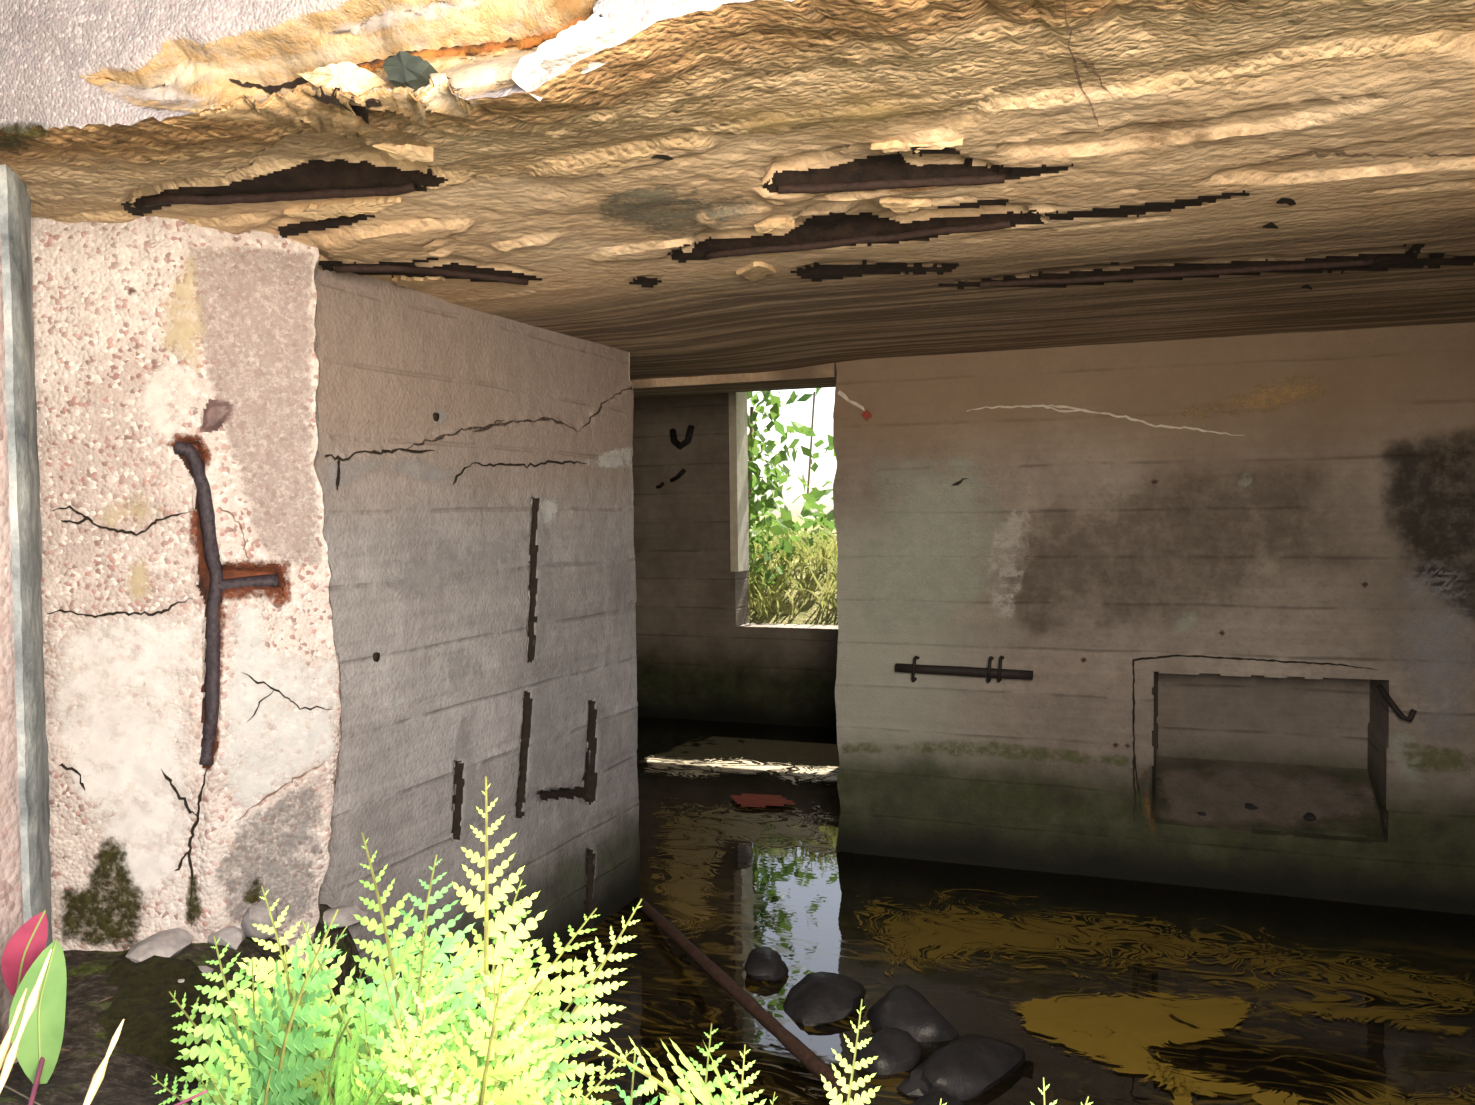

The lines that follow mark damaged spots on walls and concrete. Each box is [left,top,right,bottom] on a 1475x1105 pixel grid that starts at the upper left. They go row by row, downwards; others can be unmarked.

spalling [79,0,627,238]
spalling [668,139,1475,290]
spalling [629,277,662,288]
crack [967,405,1244,436]
crack [52,505,249,559]
damp [1387,436,1475,611]
crack [325,386,632,935]
crack [161,765,209,885]
crack [236,762,325,821]